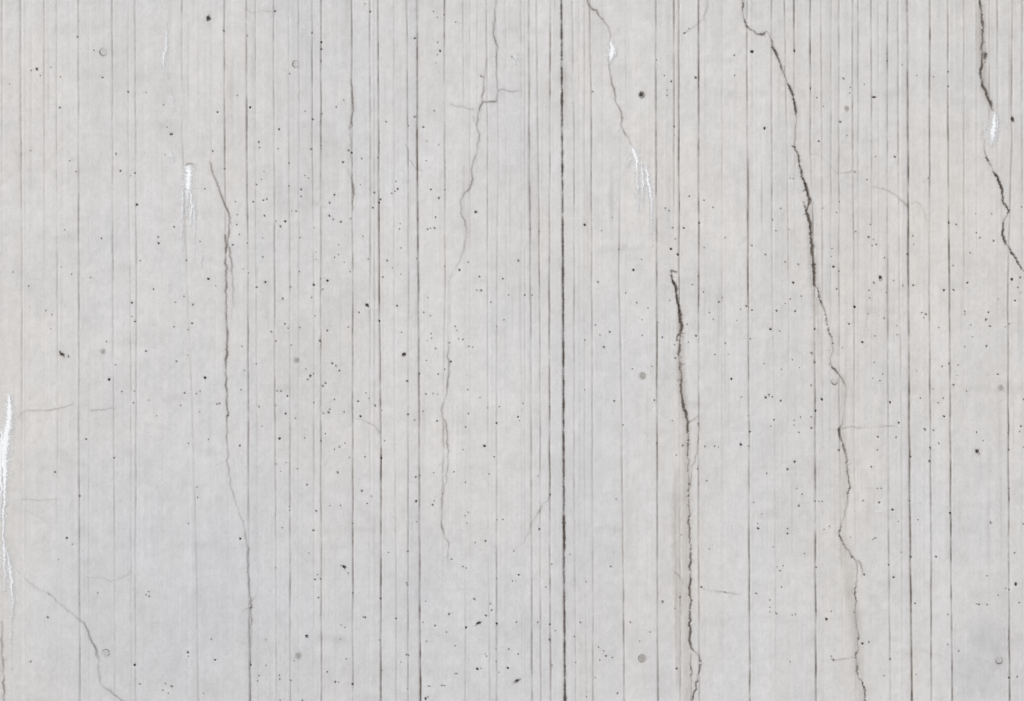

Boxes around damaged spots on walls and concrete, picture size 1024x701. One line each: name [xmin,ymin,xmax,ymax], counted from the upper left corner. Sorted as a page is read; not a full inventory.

crack [742,0,797,114]
crack [979,0,992,108]
leakage [181,165,196,241]
crack [794,147,825,311]
crack [986,156,1023,270]
crack [671,270,689,445]
leakage [0,394,14,616]